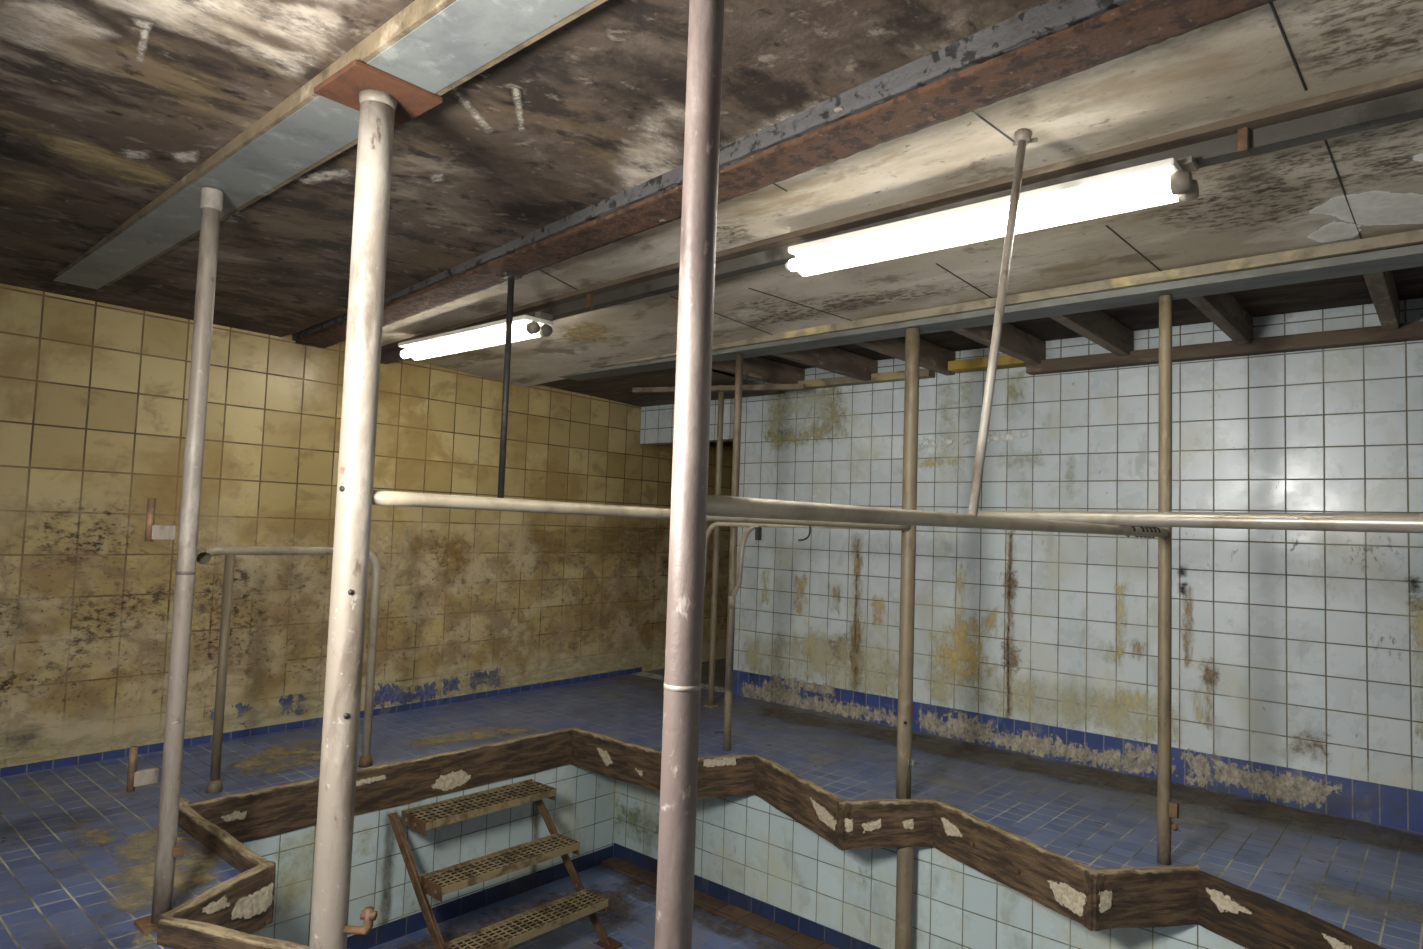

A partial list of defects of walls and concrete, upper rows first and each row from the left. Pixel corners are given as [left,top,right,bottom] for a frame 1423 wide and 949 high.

mould [1317,0,1423,72]
damp [41,137,171,185]
damp [1165,125,1423,243]
damp [39,518,122,559]
mould [73,589,165,653]
damp [199,570,263,668]